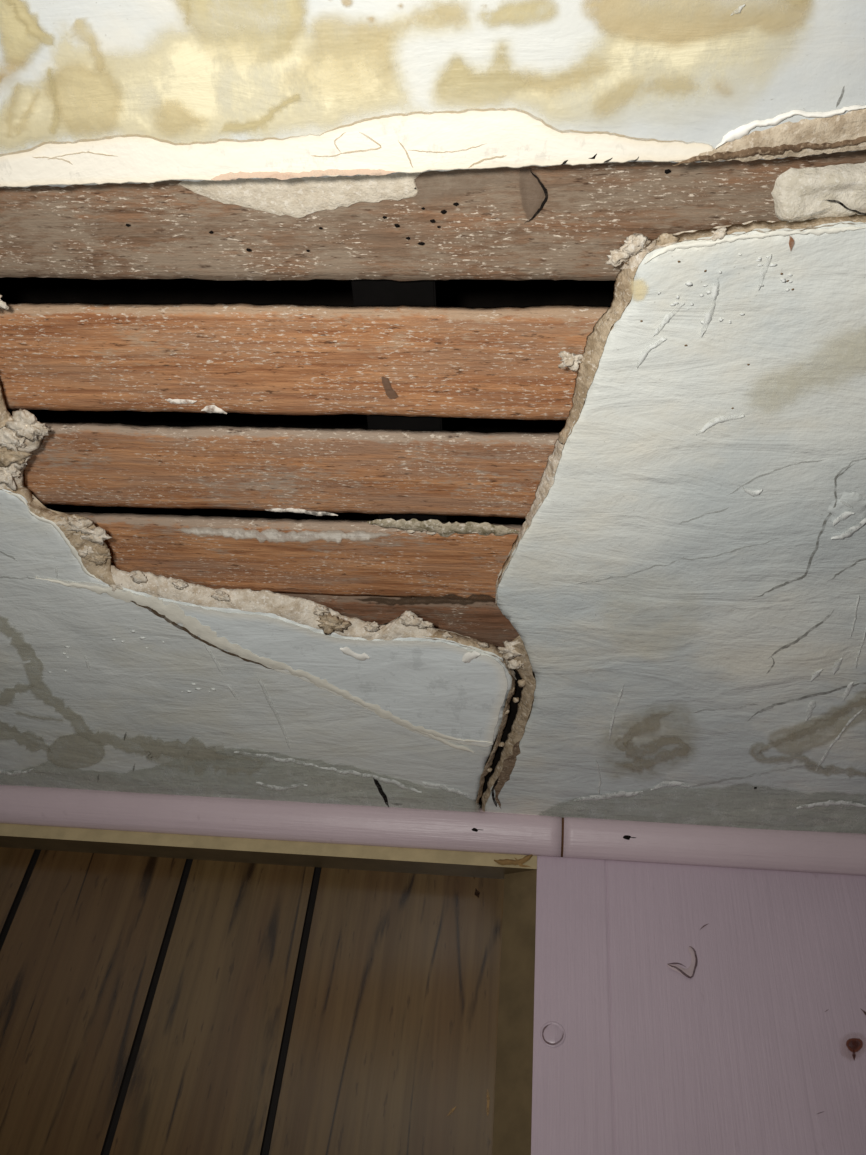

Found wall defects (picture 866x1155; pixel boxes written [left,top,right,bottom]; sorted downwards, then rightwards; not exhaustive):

damp [0,0,403,145]
damp [439,0,804,117]
peeling [0,90,866,606]
peeling [0,386,523,753]
crack [758,463,855,597]
damp [0,617,478,812]
crack [475,635,536,812]
crack [768,622,823,672]
crack [749,683,858,720]